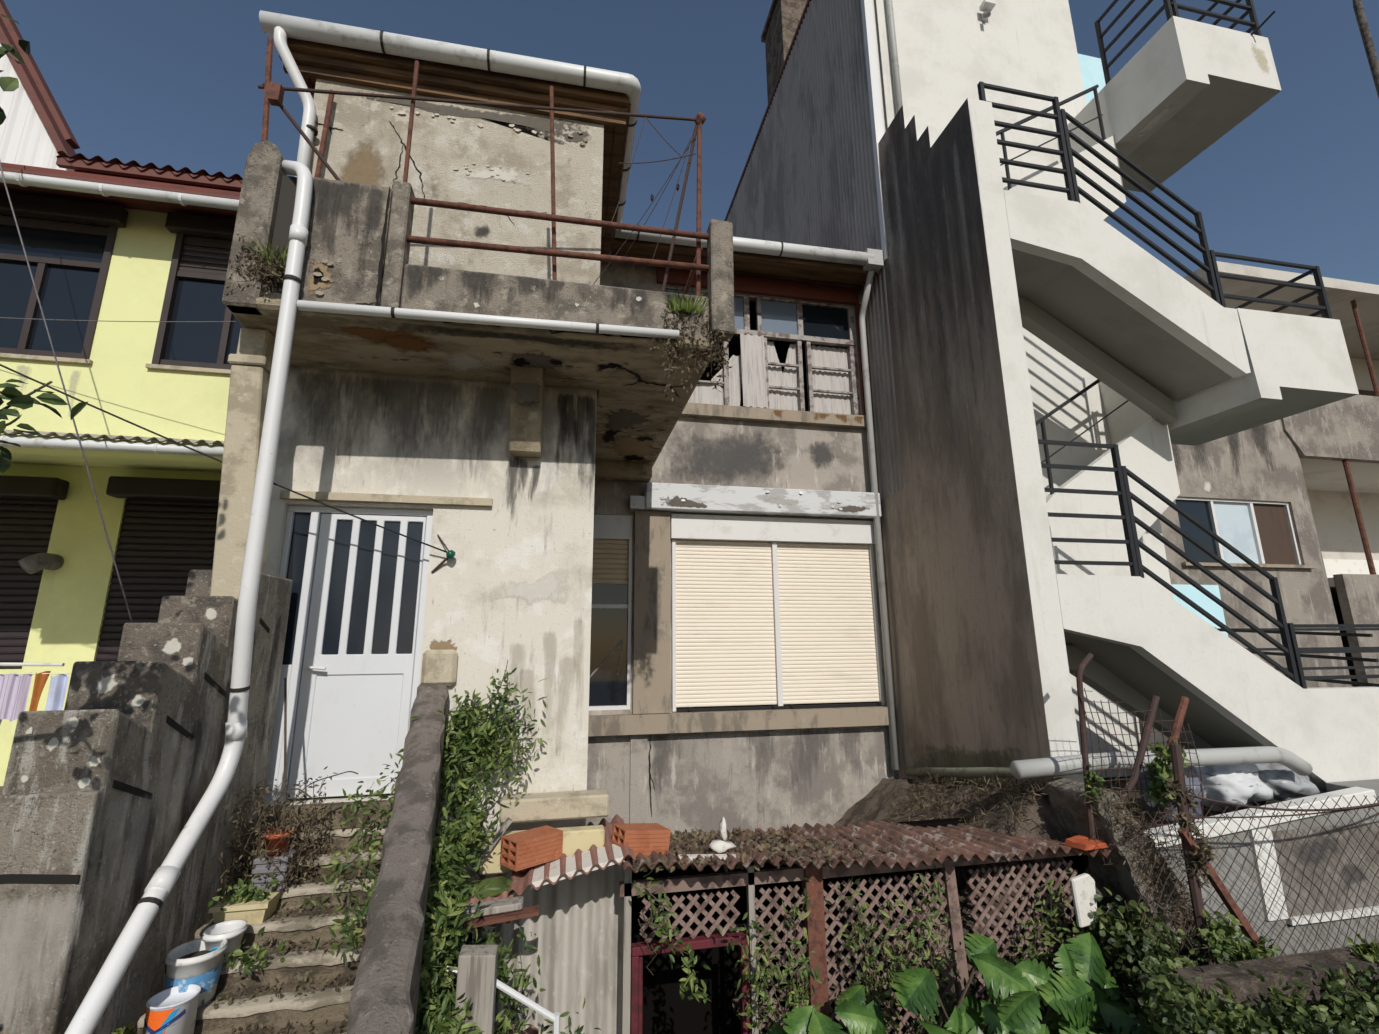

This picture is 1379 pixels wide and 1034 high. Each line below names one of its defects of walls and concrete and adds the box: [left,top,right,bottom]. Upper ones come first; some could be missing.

crack [356,121,425,306]
crack [417,318,687,397]
leakage [508,457,539,507]
leakage [557,395,595,469]
spalling [596,406,666,464]
peeling [660,496,707,508]
leakage [677,435,781,481]
leakage [811,443,832,466]
peeling [831,501,870,512]